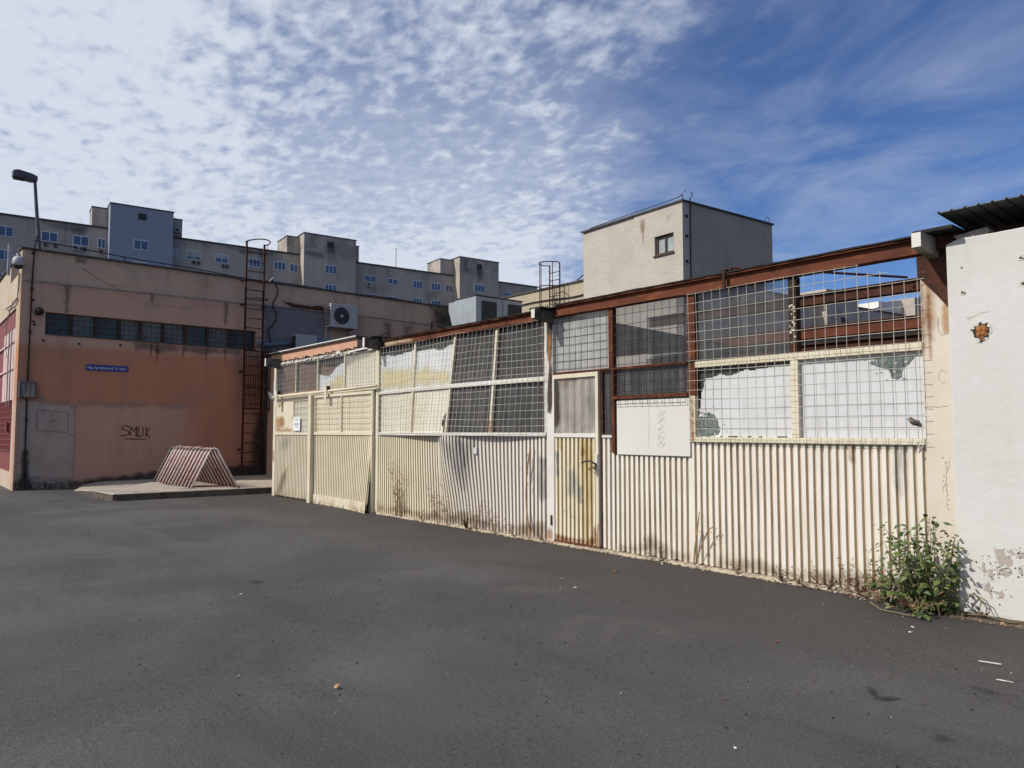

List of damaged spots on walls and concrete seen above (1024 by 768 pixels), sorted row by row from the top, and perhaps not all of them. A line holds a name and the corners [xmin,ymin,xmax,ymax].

corrosion [925,289,949,335]
spalling [969,322,990,343]
peeling [975,546,1024,605]